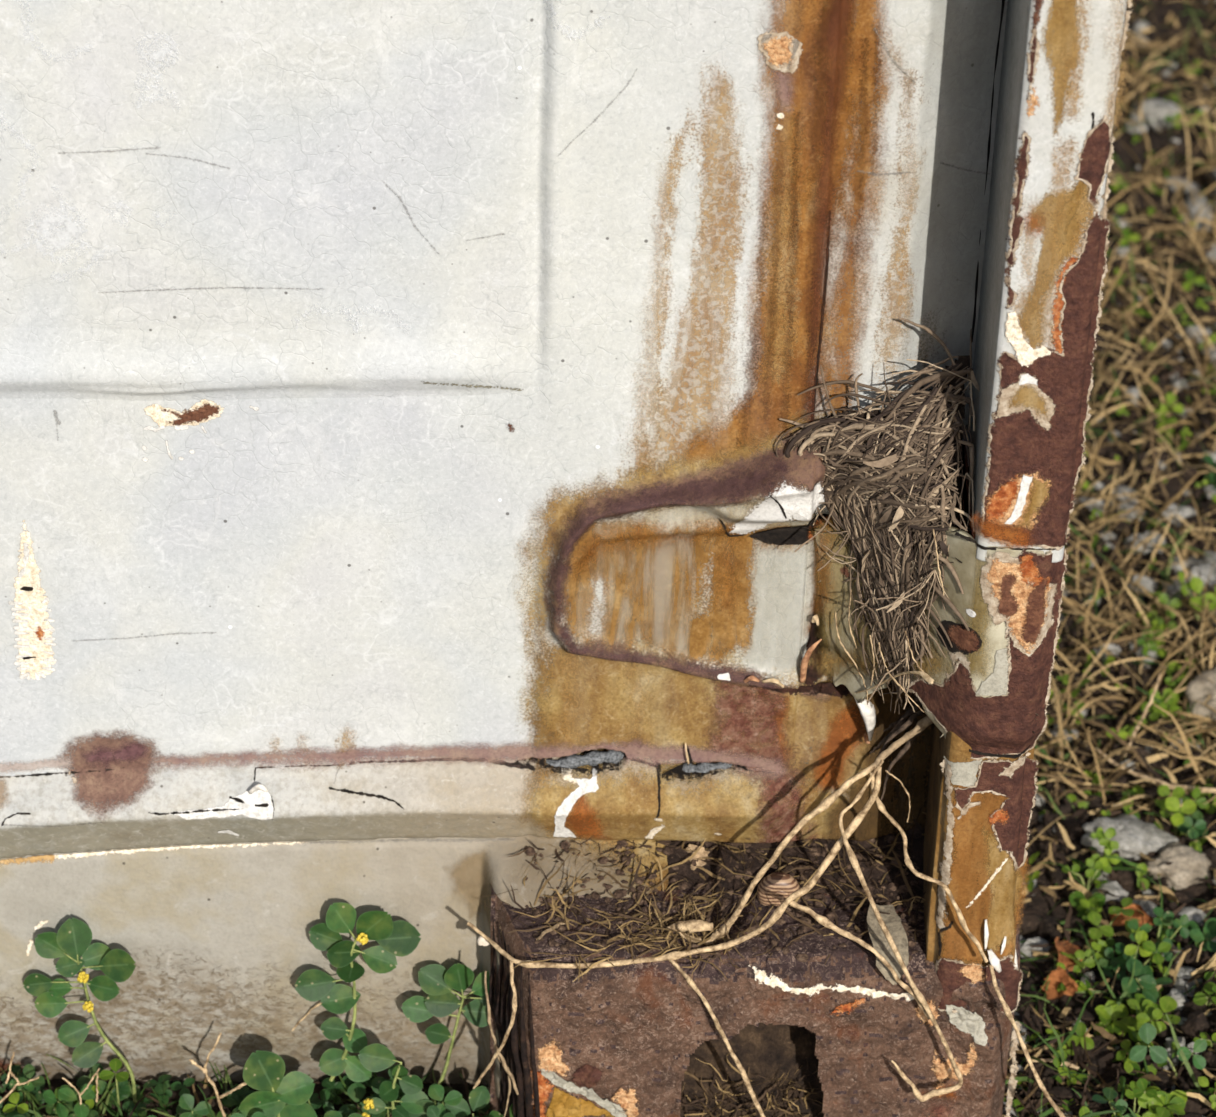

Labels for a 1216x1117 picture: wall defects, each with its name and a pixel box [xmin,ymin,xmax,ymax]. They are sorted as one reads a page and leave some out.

peeling [993,311,1056,431]
peeling [143,399,224,460]
corrosion [0,0,916,891]
peeling [985,471,1052,530]
corrosion [905,0,1132,1019]
crack [254,743,772,818]
peeling [553,768,599,837]
corrosion [848,723,935,841]
peeling [936,756,982,929]
peeling [531,1038,639,1117]
corrosion [931,1043,978,1098]
corrosion [1004,1021,1022,1117]